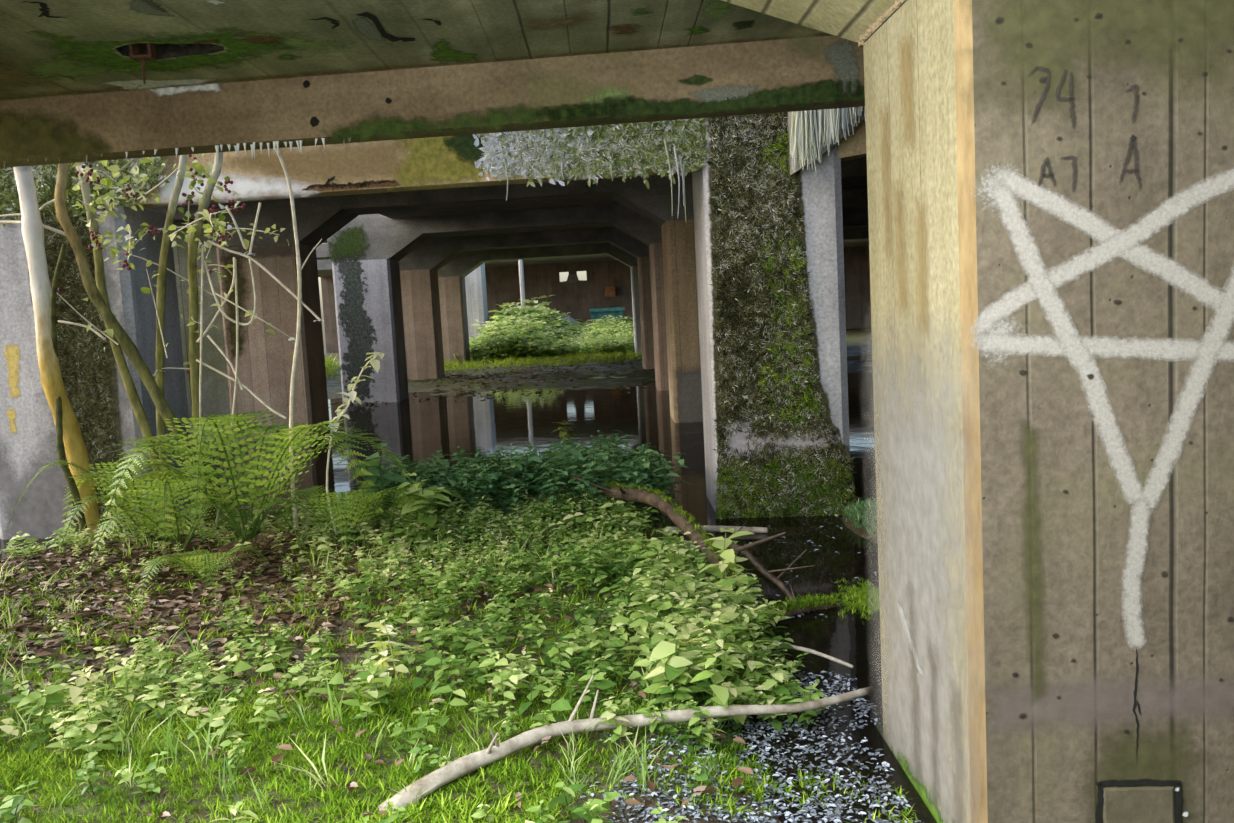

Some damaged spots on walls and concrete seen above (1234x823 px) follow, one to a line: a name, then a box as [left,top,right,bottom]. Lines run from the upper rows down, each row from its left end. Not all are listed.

spalling [115,43,224,84]
damp [0,54,344,99]
damp [679,75,758,102]
damp [1001,427,1234,725]
crack [1132,646,1141,757]